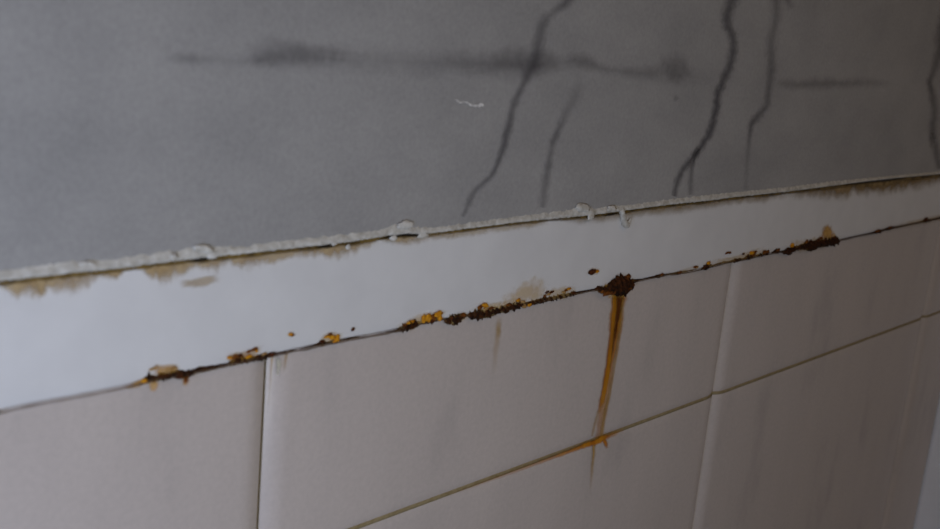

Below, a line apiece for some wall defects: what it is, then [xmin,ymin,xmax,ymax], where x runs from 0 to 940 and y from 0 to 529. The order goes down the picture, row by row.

crack [677,4,734,183]
rust [104,217,940,465]